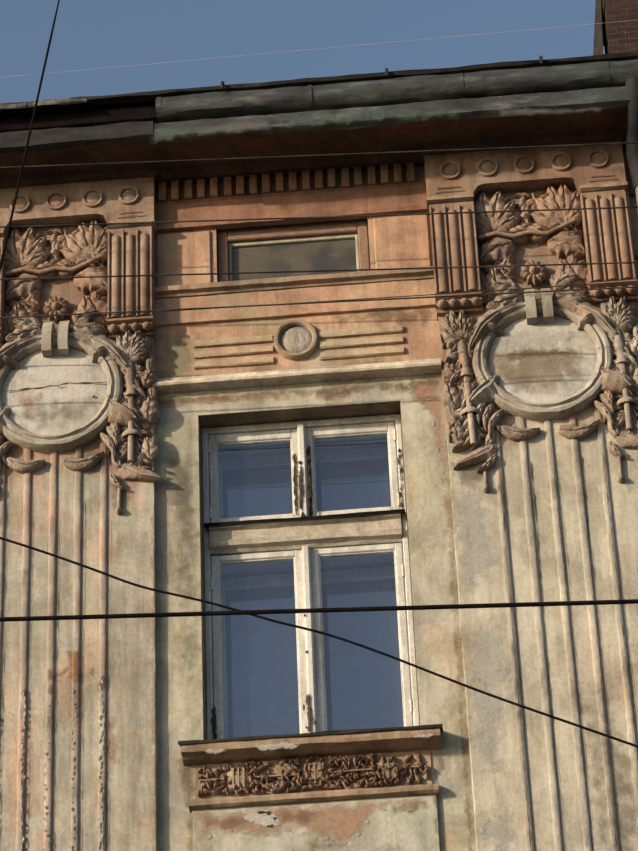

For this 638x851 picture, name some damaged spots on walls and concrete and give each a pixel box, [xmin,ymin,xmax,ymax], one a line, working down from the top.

crack [9,382,106,391]
water stain [497,350,578,387]
peeling [292,445,313,517]
peeling [303,694,317,732]
flaking render [258,742,297,750]
peeling [200,804,386,840]